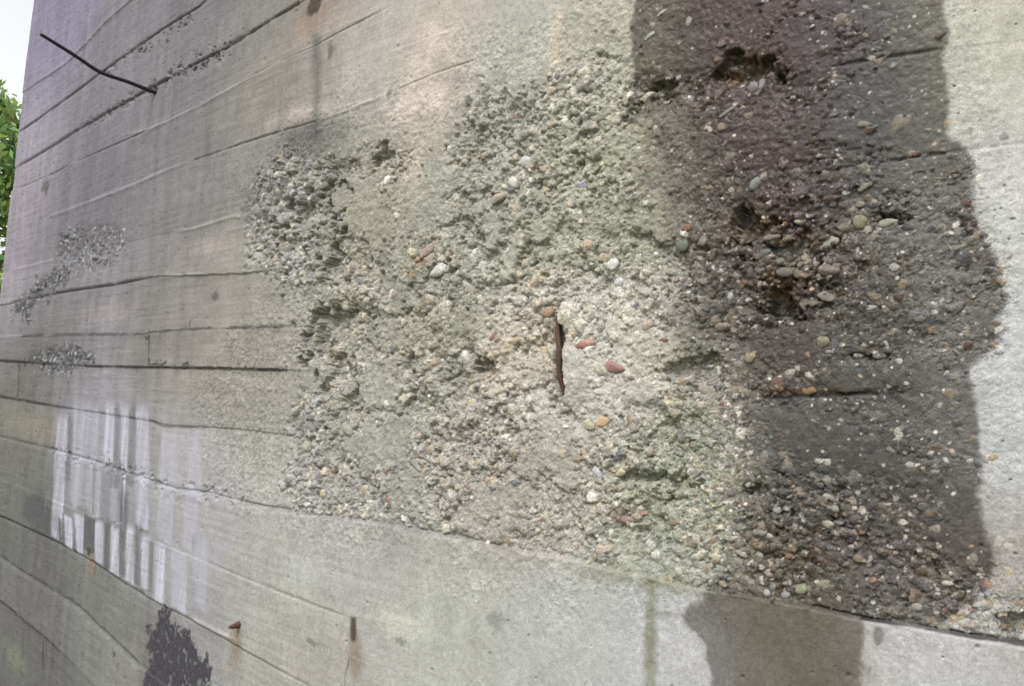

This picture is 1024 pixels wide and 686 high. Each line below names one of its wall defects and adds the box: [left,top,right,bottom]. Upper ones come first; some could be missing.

hole [711,51,787,86]
hole [373,142,396,172]
spalling [268,167,352,287]
hole [872,212,911,225]
hole [732,206,829,329]
spalling [302,302,362,414]
hole [474,357,498,380]
hole [664,350,726,395]
spalling [625,465,706,492]
hole [742,483,777,498]